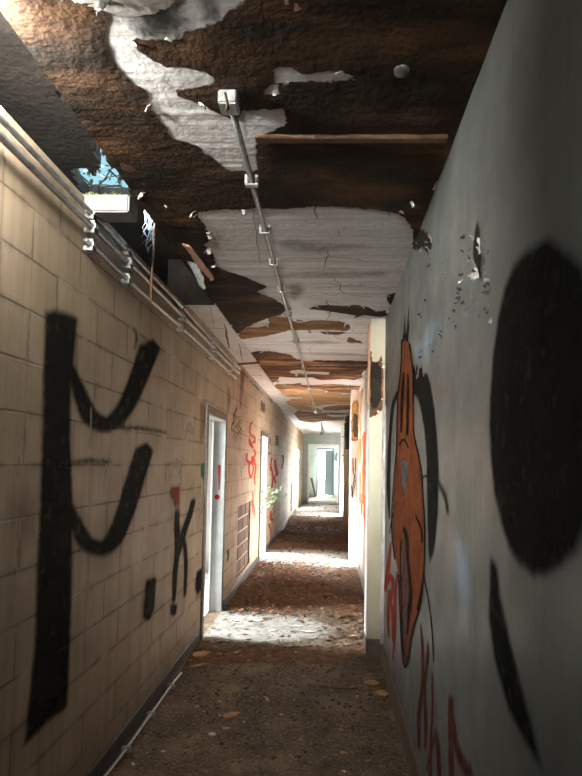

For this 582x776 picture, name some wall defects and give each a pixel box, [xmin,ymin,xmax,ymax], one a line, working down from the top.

peeling [0,0,507,344]
peeling [251,351,385,450]